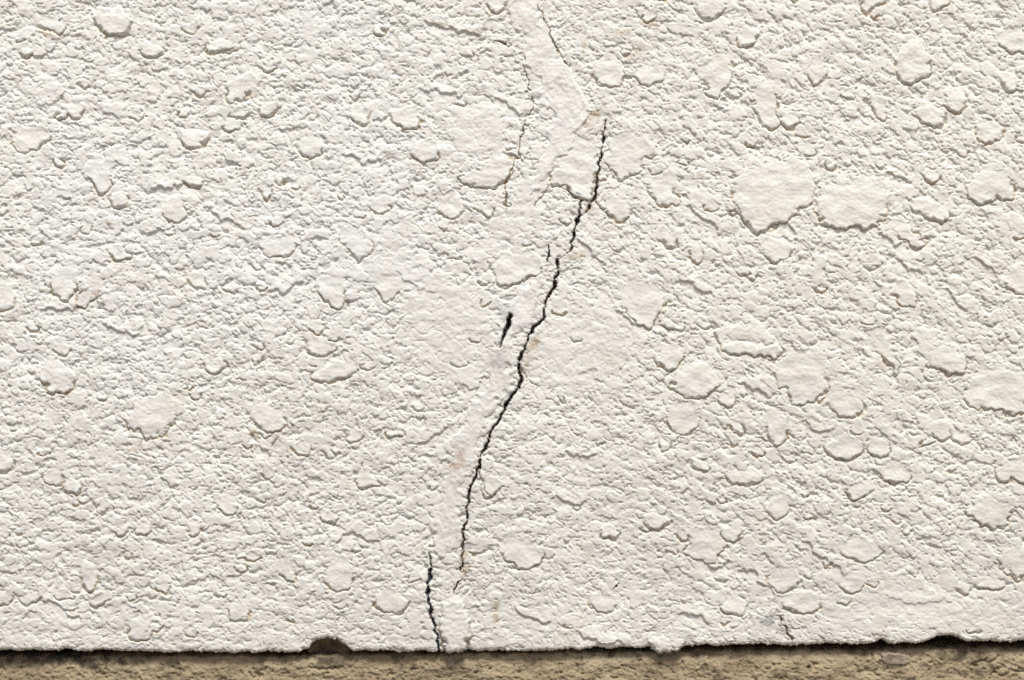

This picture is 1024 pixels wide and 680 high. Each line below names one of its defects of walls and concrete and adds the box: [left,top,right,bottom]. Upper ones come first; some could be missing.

crack [537,7,570,67]
crack [494,40,534,212]
crack [425,120,614,651]